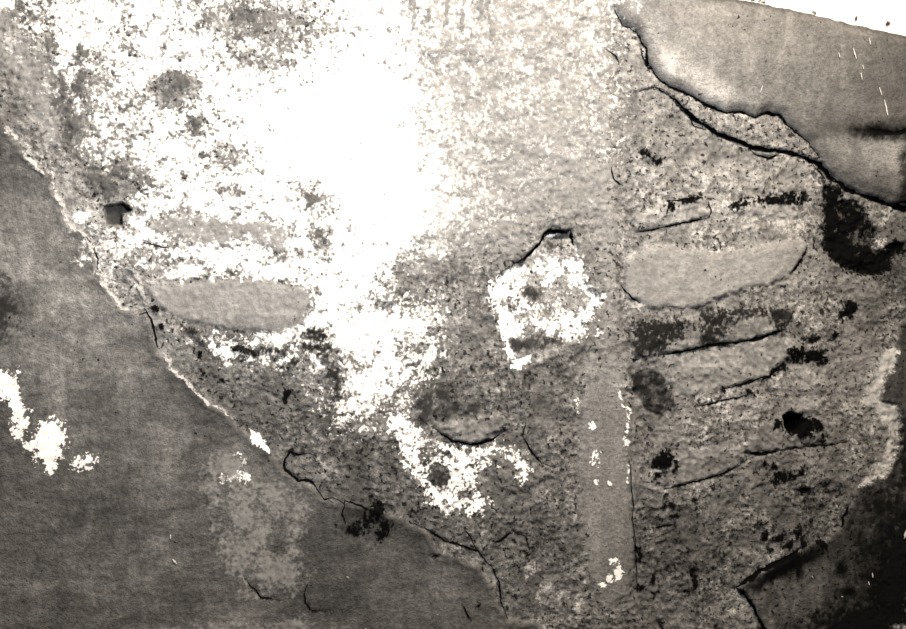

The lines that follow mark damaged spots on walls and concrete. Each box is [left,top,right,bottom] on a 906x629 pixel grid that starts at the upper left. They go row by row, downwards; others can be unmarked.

crack [614,10,906,212]
crack [639,197,712,232]
water stain [824,184,845,237]
crack [512,229,575,266]
water stain [851,238,906,275]
crack [660,331,780,355]
water stain [696,304,799,344]
crack [699,359,788,406]
crack [664,442,845,489]
water stain [784,416,906,629]
crack [734,546,804,629]
water stain [750,545,823,591]